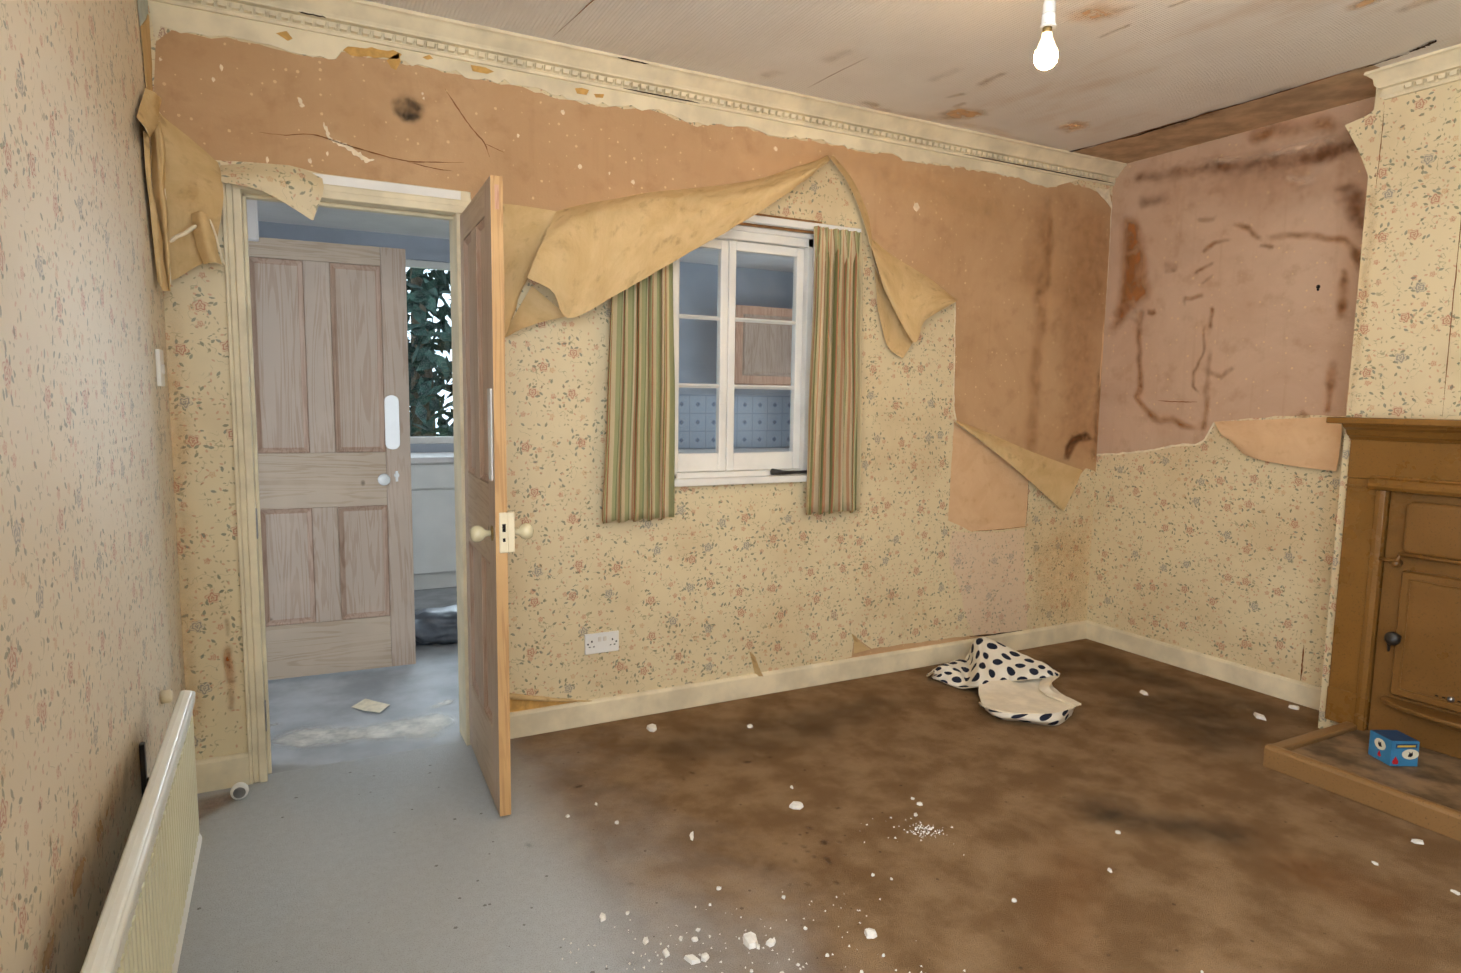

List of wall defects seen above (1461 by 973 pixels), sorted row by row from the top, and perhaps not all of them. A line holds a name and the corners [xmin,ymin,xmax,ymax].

crack [261,89,503,171]
water stain [1249,145,1352,166]
flaking render [136,0,1385,532]
water stain [1120,222,1155,320]